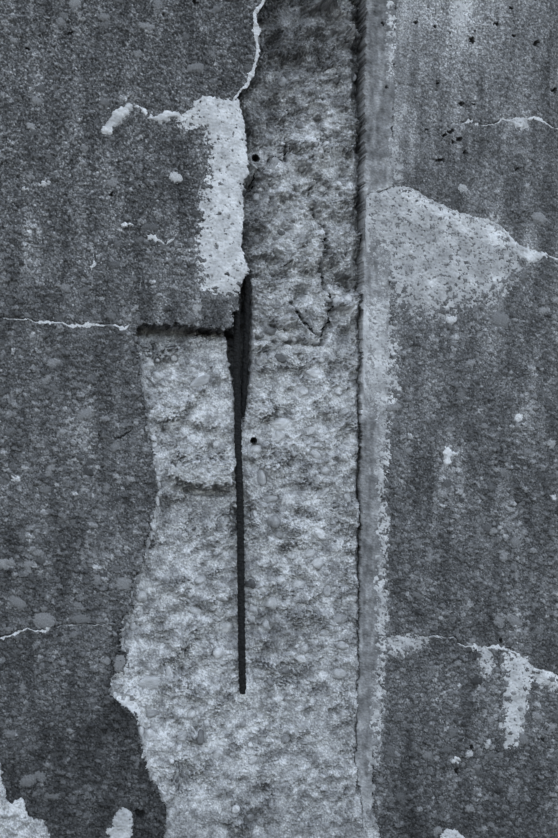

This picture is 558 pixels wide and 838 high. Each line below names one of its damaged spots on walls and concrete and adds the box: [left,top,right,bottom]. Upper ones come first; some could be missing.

crack [450,116,558,129]
crack [0,317,133,330]
spalling [107,0,369,838]
crack [0,621,119,640]